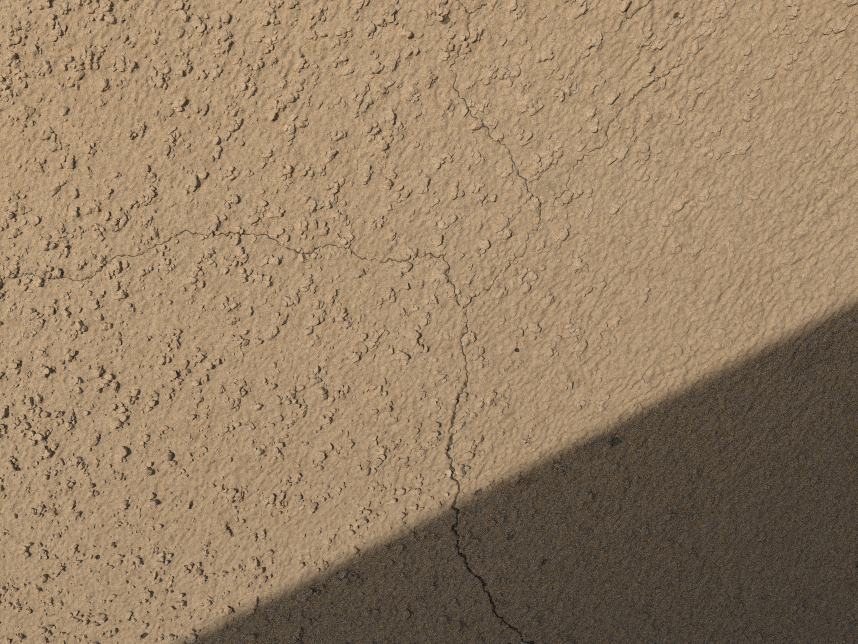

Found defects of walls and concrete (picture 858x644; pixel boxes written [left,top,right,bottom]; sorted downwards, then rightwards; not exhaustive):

crack [1,254,103,281]
crack [110,0,689,644]